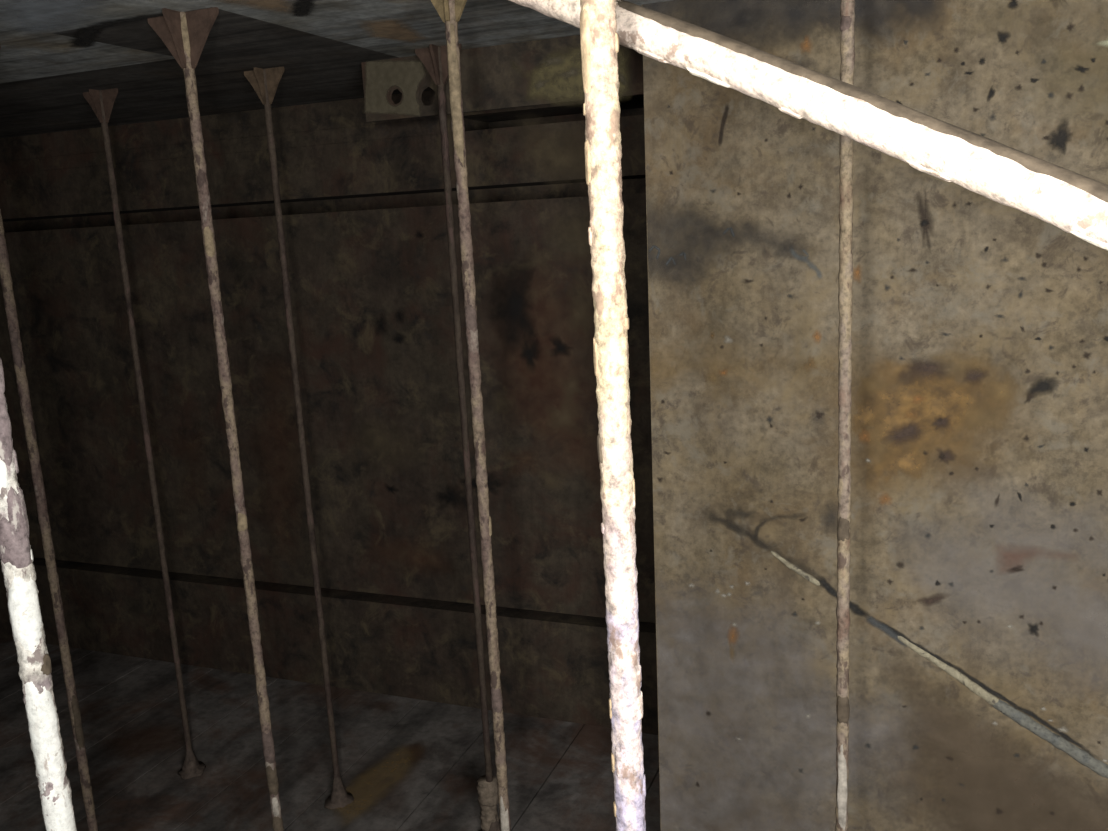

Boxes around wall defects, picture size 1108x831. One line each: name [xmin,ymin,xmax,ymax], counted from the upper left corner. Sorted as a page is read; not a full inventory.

rust [854,360,1010,484]
crack [771,551,1108,778]